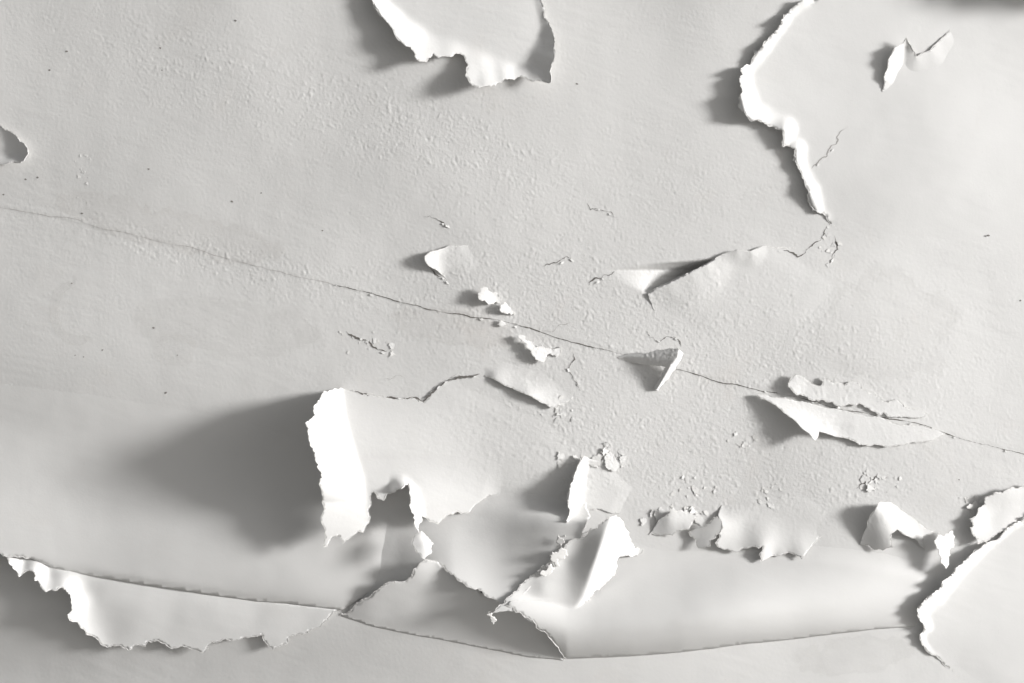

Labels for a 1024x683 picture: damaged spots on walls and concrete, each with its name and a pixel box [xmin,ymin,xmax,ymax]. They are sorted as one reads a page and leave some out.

peeling [372,0,556,88]
peeling [648,0,1024,344]
crack [0,207,612,388]
peeling [425,245,479,278]
peeling [478,286,516,326]
crack [772,230,840,263]
crack [346,331,478,403]
crack [648,334,1022,454]
peeling [756,374,946,448]
peeling [0,334,644,661]
peeling [640,468,828,562]
peeling [860,469,1024,683]